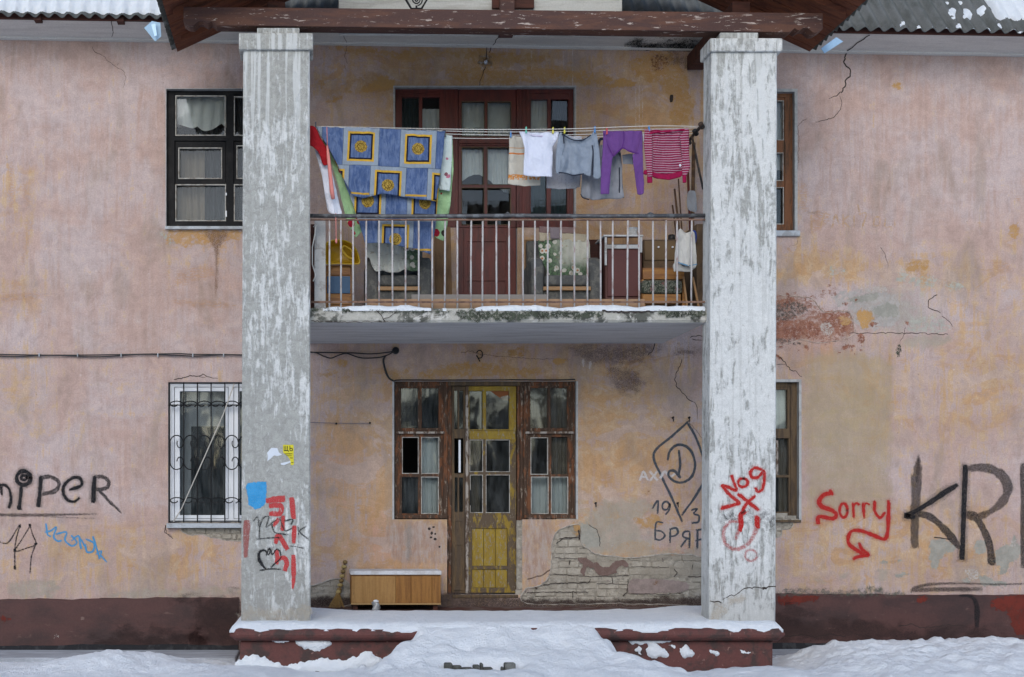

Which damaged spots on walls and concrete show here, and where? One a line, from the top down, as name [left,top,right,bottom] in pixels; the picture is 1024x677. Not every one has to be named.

crack [798,35,870,151]
leakage [160,230,243,309]
flaking render [776,284,880,360]
crack [849,295,952,341]
crack [674,335,702,438]
flaking render [515,517,753,620]